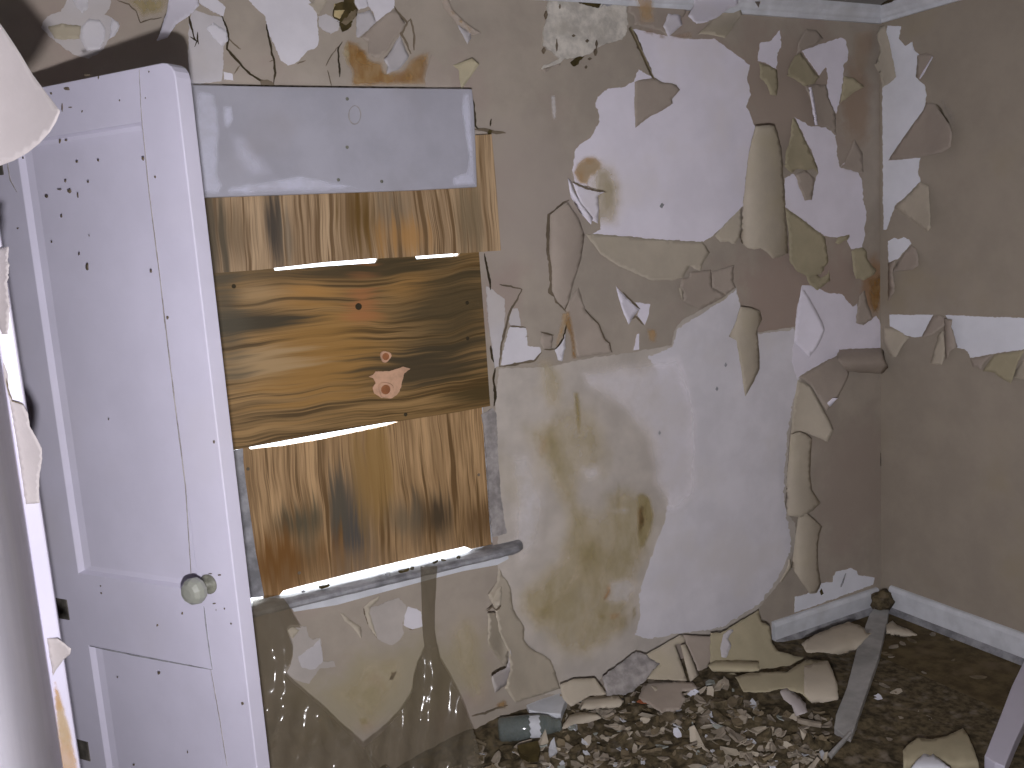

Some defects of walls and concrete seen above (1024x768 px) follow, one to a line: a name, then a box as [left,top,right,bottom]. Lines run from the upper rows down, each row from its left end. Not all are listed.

crack [188,16,199,47]
flaking render [157,0,233,85]
flaking render [249,0,368,65]
crack [222,16,425,89]
hole [570,34,598,69]
peeling [663,14,682,36]
damp [587,363,693,506]
damp [516,460,539,548]
damp [525,393,653,651]
flaking render [363,596,422,645]
flaking render [794,568,874,612]